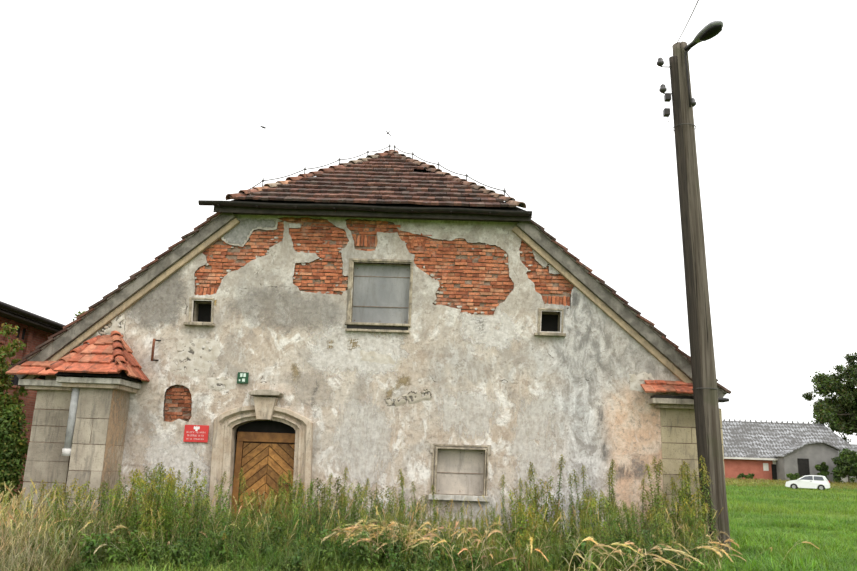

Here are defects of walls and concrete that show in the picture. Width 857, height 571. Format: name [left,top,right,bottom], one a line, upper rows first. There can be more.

flaking render [195,217,514,315]
flaking render [519,241,574,309]
spalling [383,388,432,409]